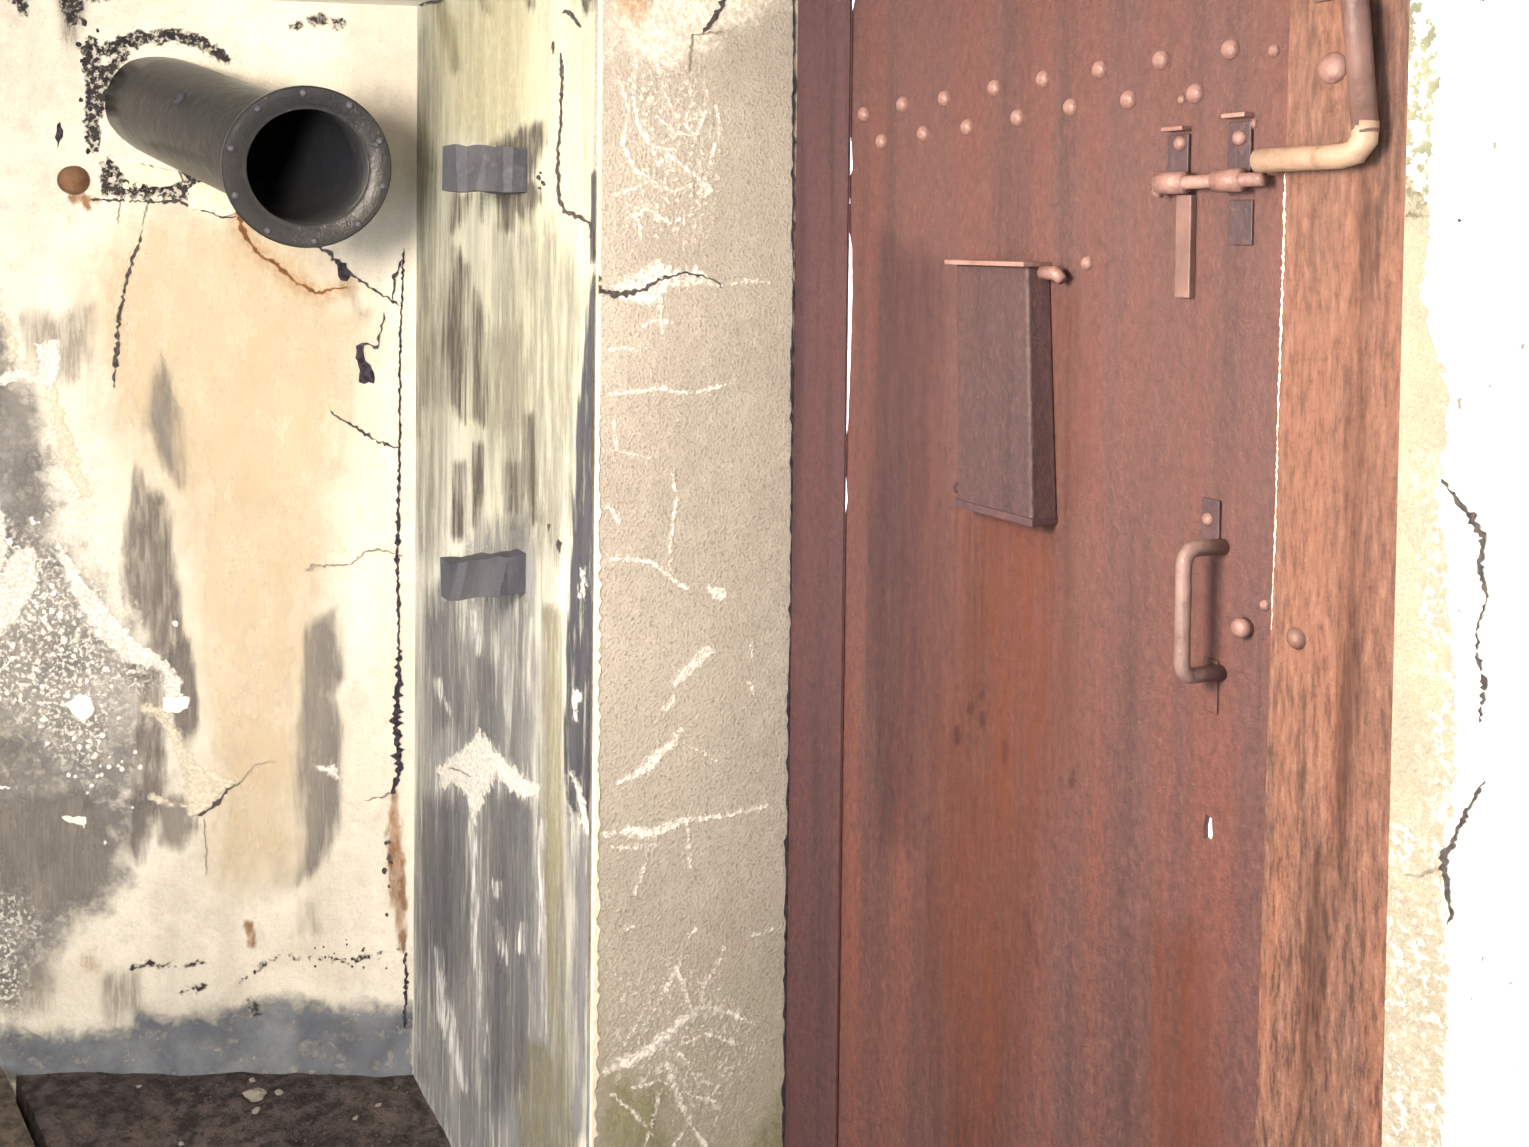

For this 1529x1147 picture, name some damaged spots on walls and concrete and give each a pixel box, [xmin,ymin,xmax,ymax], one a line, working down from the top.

water stain [8,0,28,16]
flaking render [55,122,63,146]
water stain [59,0,109,35]
flaking render [75,1,238,219]
water stain [289,13,345,31]
flaking render [0,536,235,816]
water stain [0,123,589,1147]
crack [236,213,405,801]
crack [551,0,796,1147]
crack [1441,478,1489,723]
corrosion [382,793,407,952]
crack [1404,779,1485,925]